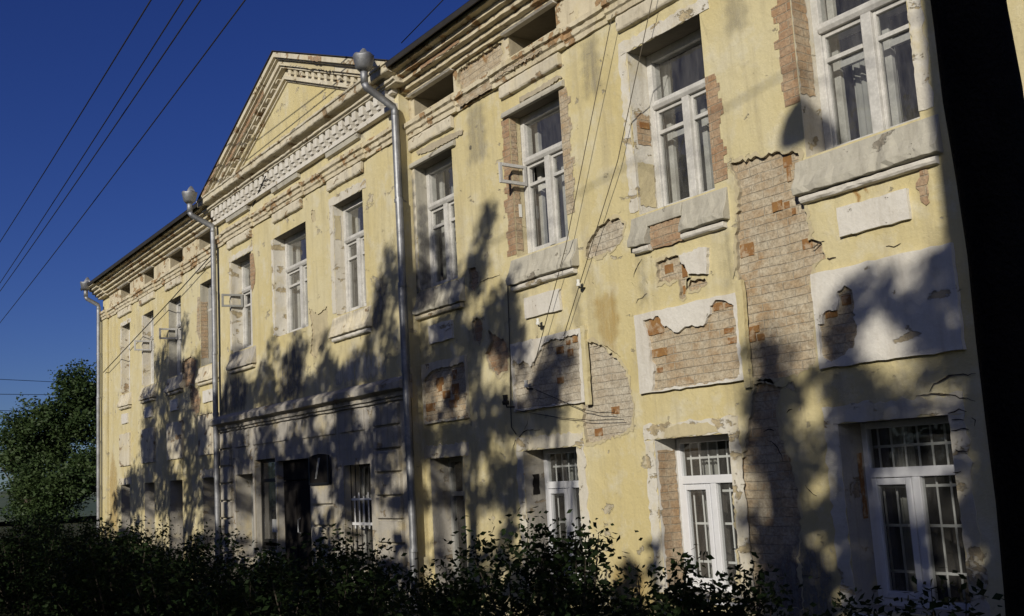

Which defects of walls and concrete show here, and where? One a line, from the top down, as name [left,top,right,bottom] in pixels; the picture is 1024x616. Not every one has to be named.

spalling [719,105,793,280]
flaking render [772,199,799,215]
spalling [586,218,622,258]
spalling [656,246,705,299]
flaking render [647,317,664,336]
flaking render [713,302,733,311]
flaking render [724,325,765,344]
flaking render [813,294,852,319]
flaking render [652,347,668,373]
flaking render [426,369,460,412]
spalling [583,402,620,443]
crack [918,373,976,473]